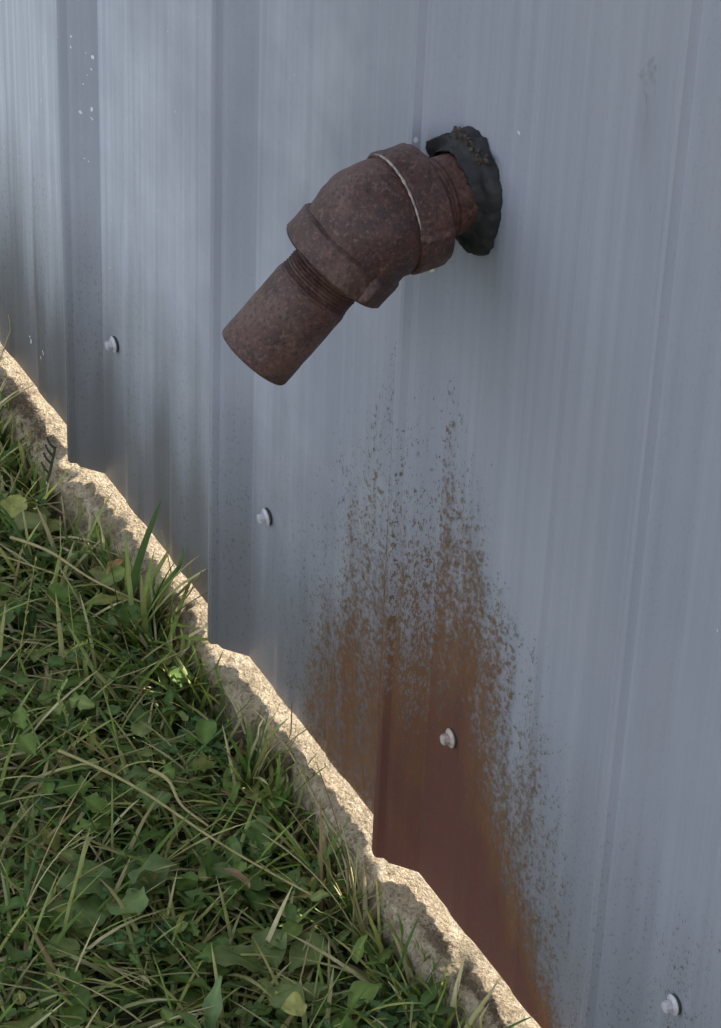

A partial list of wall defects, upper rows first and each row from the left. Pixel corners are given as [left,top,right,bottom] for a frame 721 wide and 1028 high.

corrosion [276,337,580,1028]